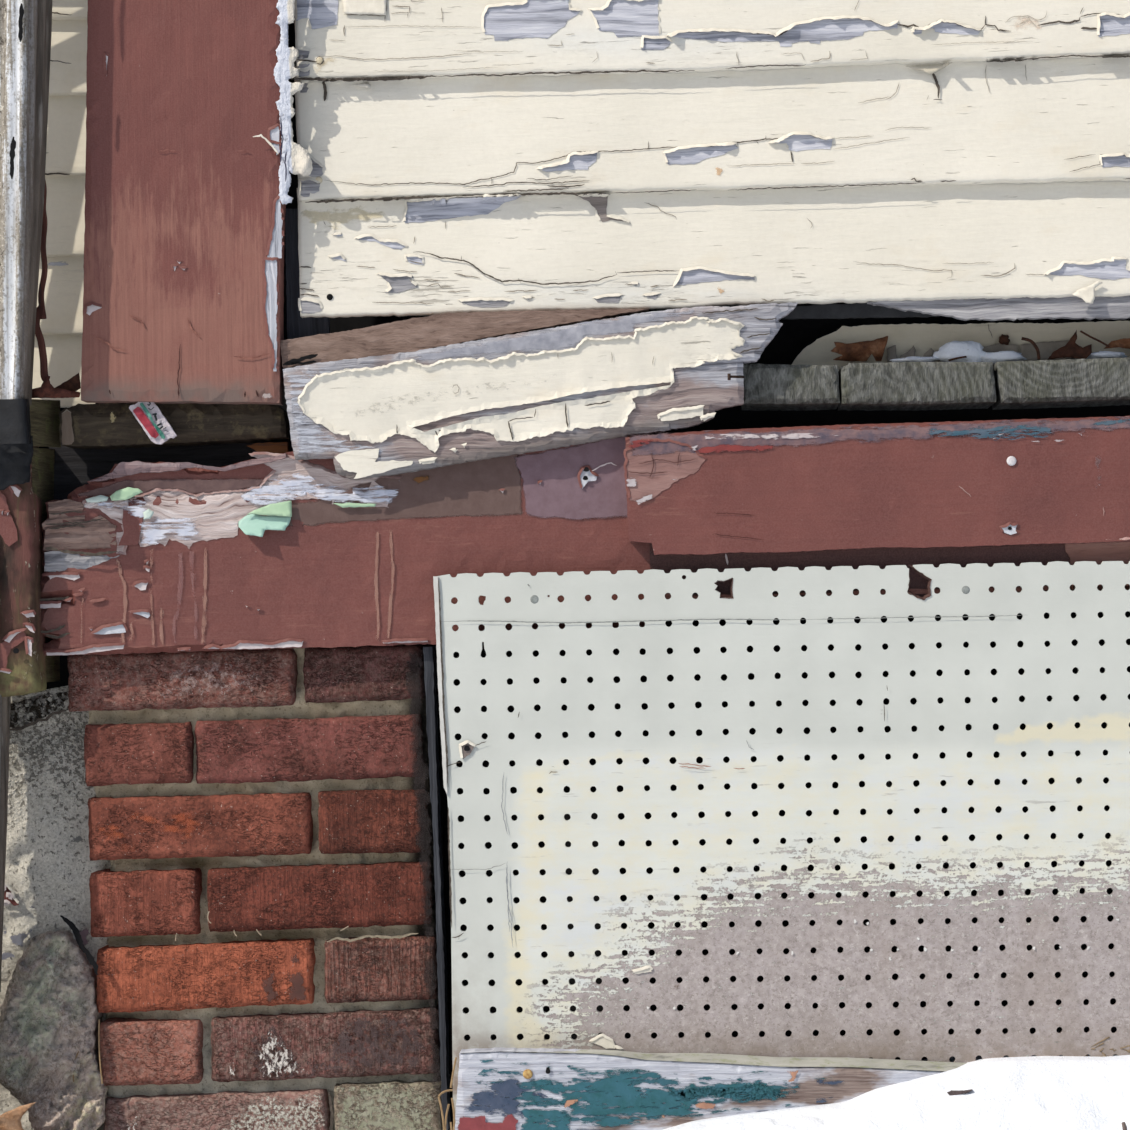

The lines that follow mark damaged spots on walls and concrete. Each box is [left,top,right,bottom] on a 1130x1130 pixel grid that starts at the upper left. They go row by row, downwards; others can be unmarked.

peeling [481,0,898,50]
crack [736,30,868,63]
crack [897,8,1120,92]
crack [927,73,942,100]
crack [326,142,675,192]
crack [737,127,924,166]
peeling [262,195,284,372]
crack [854,261,1043,277]
peeling [623,433,819,505]
peeling [238,501,292,537]
peeling [2,572,152,656]
peeling [457,1057,799,1130]